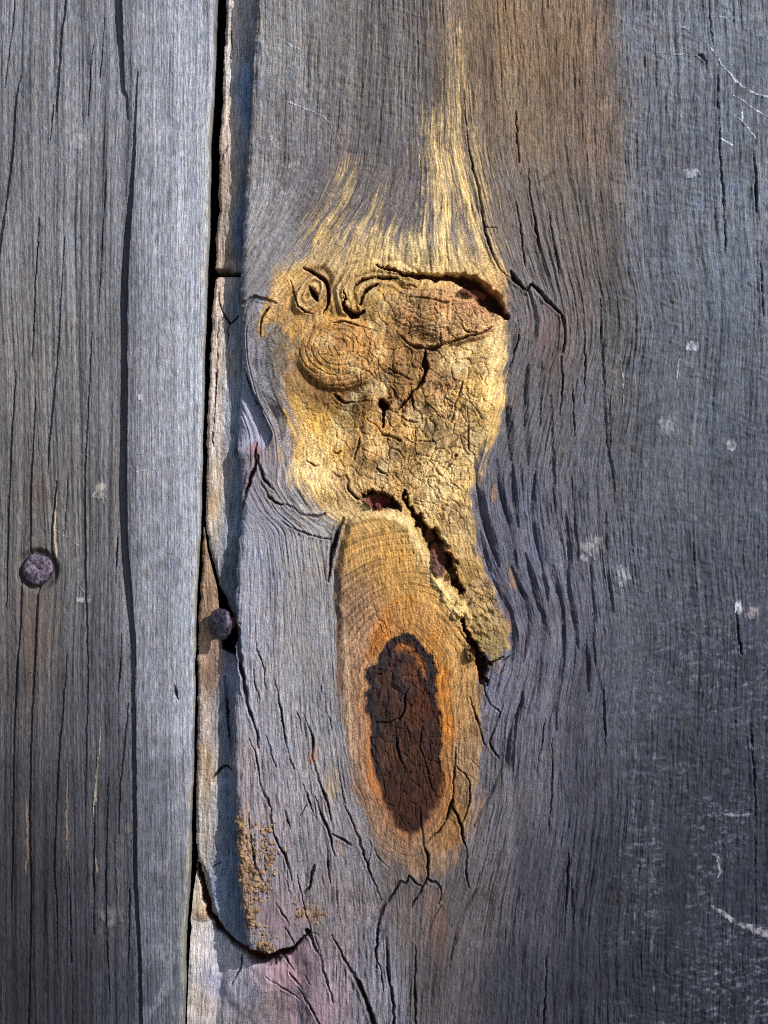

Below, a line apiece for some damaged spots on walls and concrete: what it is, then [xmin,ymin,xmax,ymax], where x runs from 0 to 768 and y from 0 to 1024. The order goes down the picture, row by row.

crack [5,0,143,1024]
crack [212,112,616,1024]